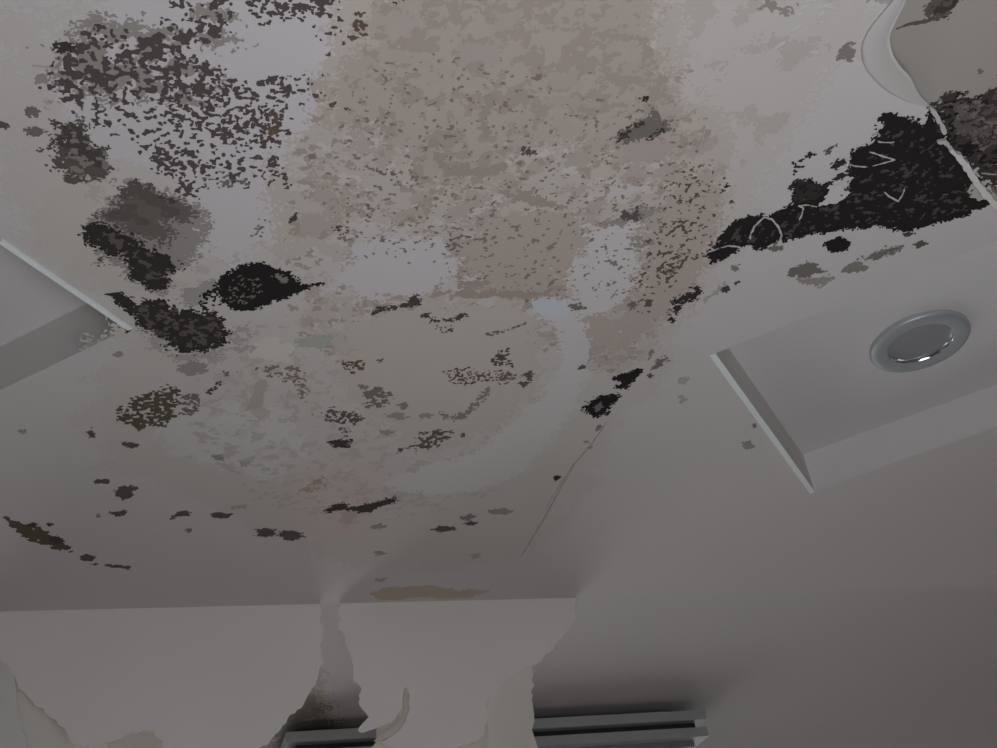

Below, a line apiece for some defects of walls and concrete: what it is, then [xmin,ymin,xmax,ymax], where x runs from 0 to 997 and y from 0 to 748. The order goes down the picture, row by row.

flaking render [819,185,850,206]
flaking render [967,184,986,201]
leakage [0,0,997,575]
leakage [370,578,490,601]